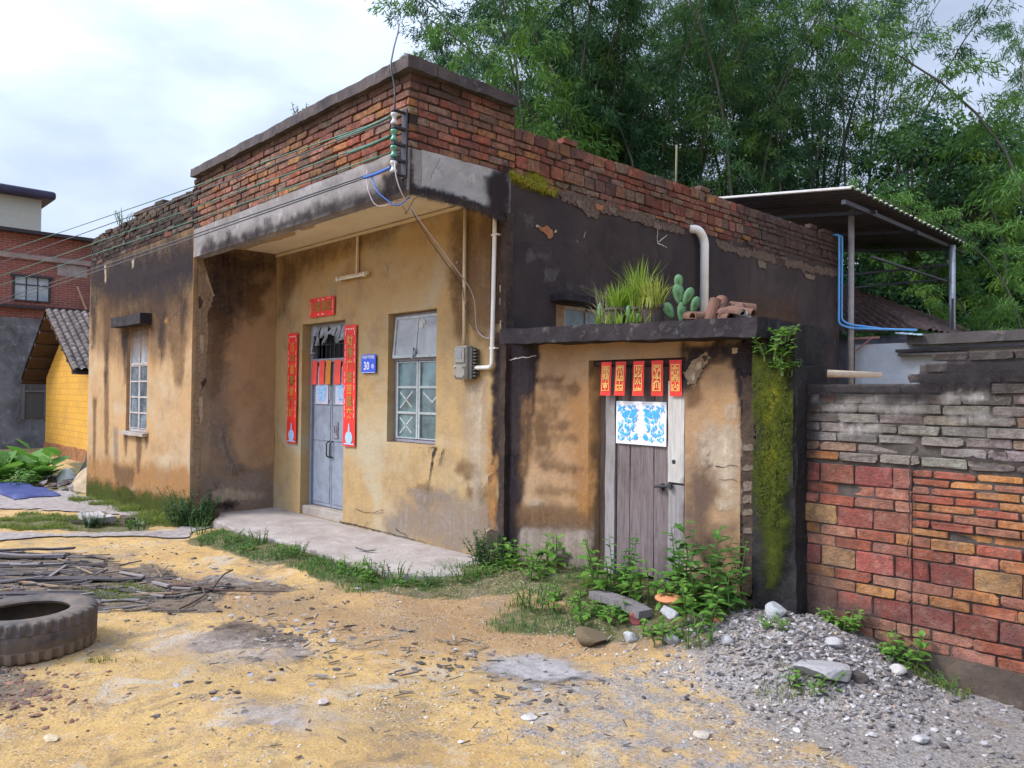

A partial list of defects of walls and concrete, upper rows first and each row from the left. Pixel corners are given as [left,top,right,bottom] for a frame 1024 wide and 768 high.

flaking render [536,225,557,239]
flaking render [558,190,684,235]
damp [86,147,591,569]
flaking render [683,352,711,386]
crack [427,447,444,488]